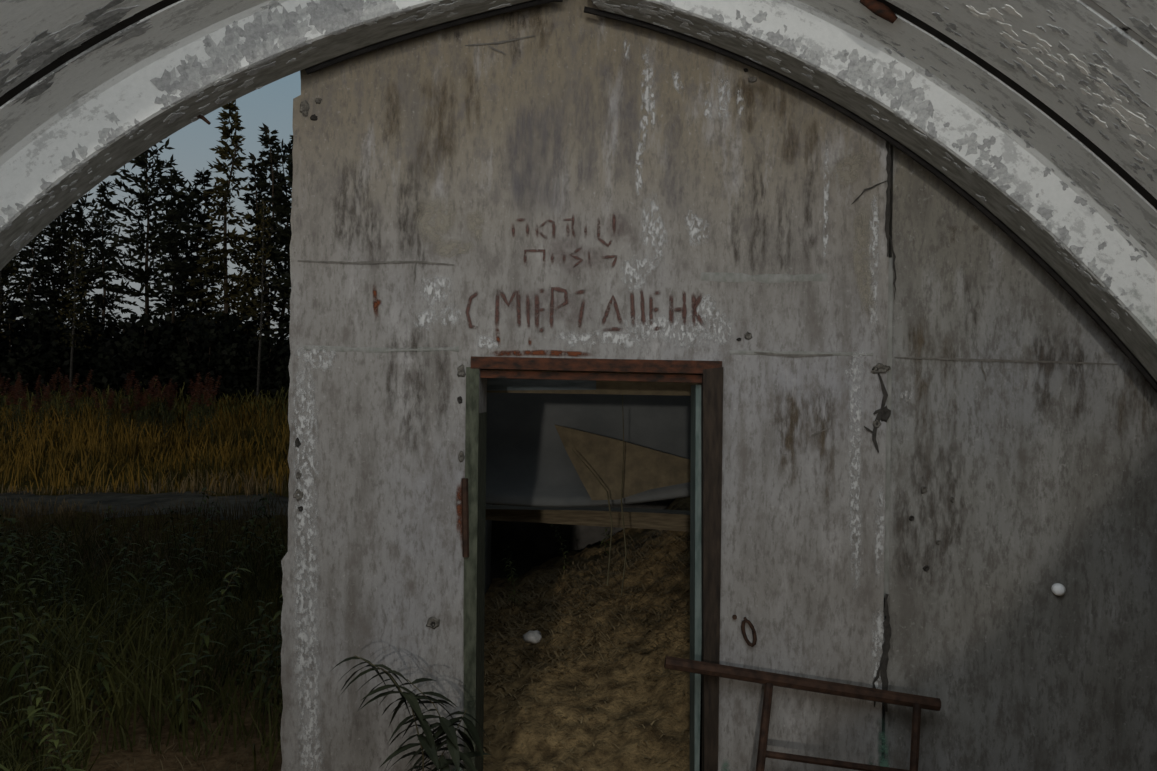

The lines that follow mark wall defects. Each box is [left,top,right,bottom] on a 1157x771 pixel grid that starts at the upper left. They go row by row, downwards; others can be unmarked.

peeling [0,112,152,250]
peeling [0,0,153,106]
peeling [150,0,515,124]
water stain [623,202,665,289]
water stain [636,54,655,192]
crack [851,133,897,299]
peeling [593,0,1157,331]
rust [859,0,898,24]
water stain [560,296,729,347]
water stain [846,351,867,580]
crack [864,357,1118,453]
water stain [872,614,884,689]